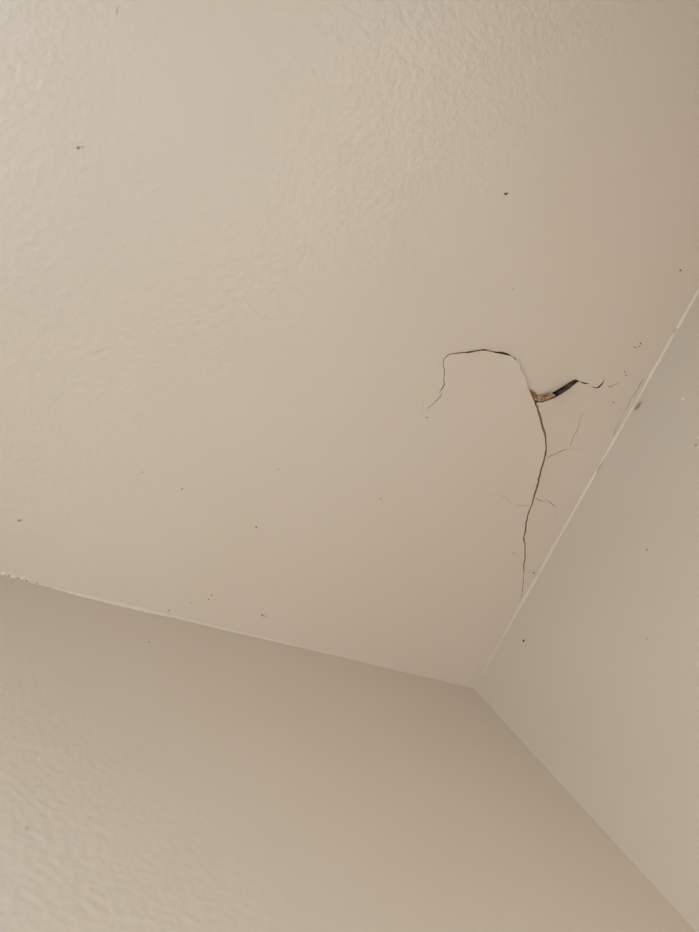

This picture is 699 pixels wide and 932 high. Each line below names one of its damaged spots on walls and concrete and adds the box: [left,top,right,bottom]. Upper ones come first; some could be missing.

crack [428,349,516,408]
crack [520,379,620,589]